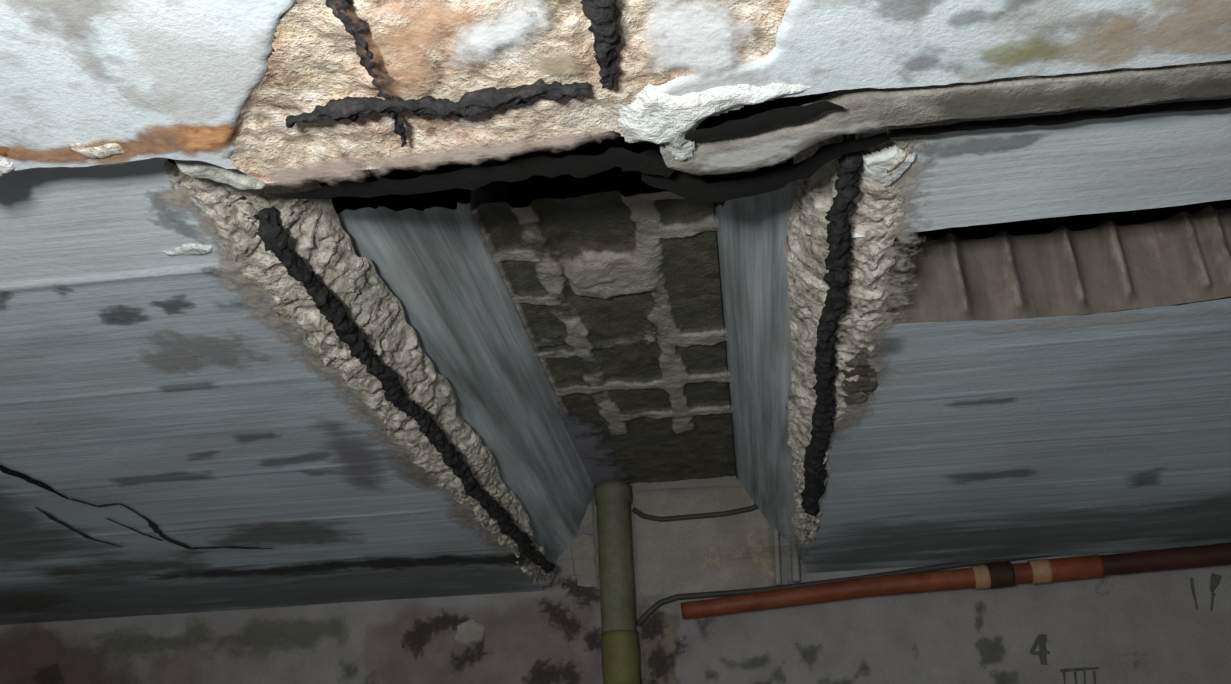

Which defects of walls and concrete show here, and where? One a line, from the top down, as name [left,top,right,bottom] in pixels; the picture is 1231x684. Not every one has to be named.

corrosion [0,122,241,163]
leakage [101,300,190,325]
spalling [660,60,1231,548]
spalling [158,0,790,684]
crack [0,465,273,550]
leakage [160,555,528,579]
leakage [0,628,136,684]